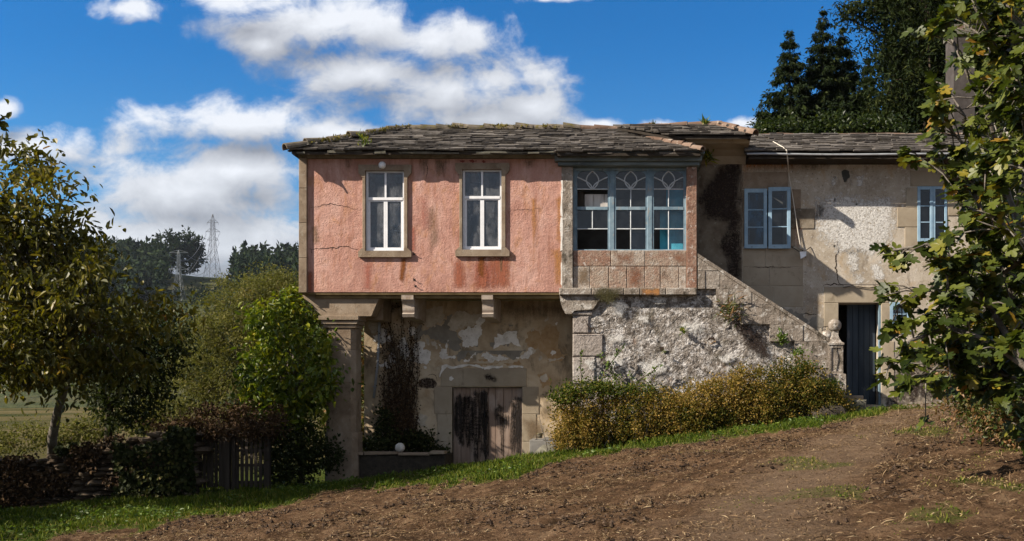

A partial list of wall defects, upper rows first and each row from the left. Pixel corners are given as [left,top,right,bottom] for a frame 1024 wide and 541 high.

corrosion [454,257,510,288]
water stain [698,164,755,279]
crack [823,231,841,286]
peeling [368,310,536,388]